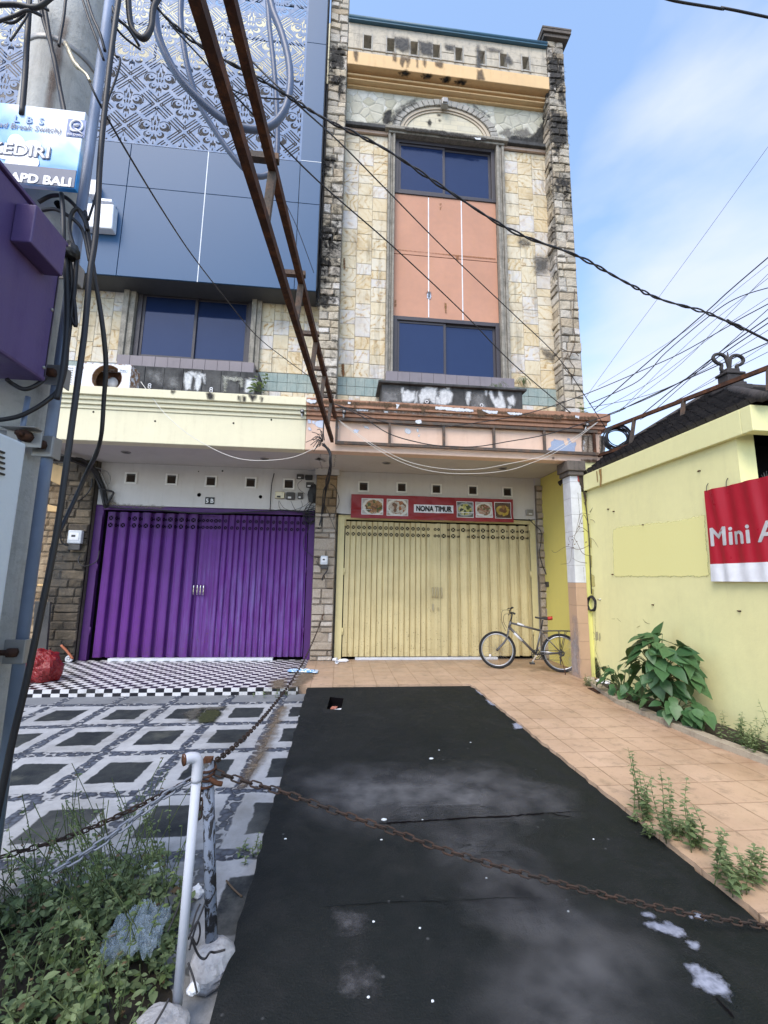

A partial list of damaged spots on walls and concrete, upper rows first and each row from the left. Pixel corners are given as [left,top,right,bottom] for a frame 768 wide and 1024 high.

water stain [393,37,454,67]
water stain [327,46,358,96]
water stain [500,58,569,156]
water stain [322,155,338,177]
water stain [319,222,337,247]
water stain [316,292,337,307]
peeling [184,372,205,391]
peeling [394,386,522,415]
crack [386,811,578,824]